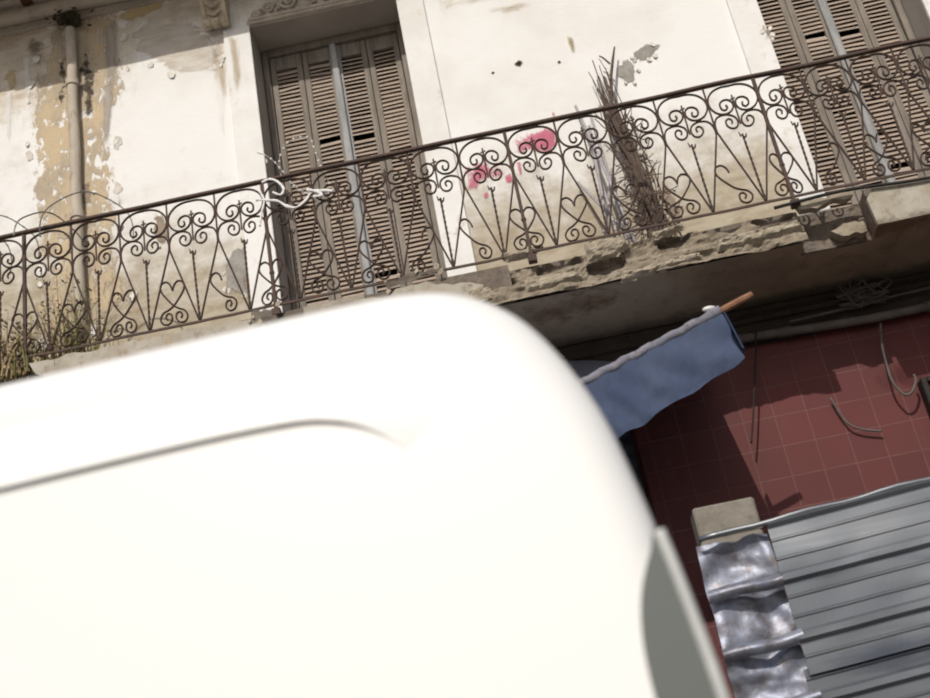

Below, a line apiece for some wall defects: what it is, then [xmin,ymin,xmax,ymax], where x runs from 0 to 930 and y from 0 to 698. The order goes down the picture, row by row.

peeling [25,1,226,350]
spalling [247,300,281,325]
spalling [384,263,444,295]
spalling [468,182,871,305]